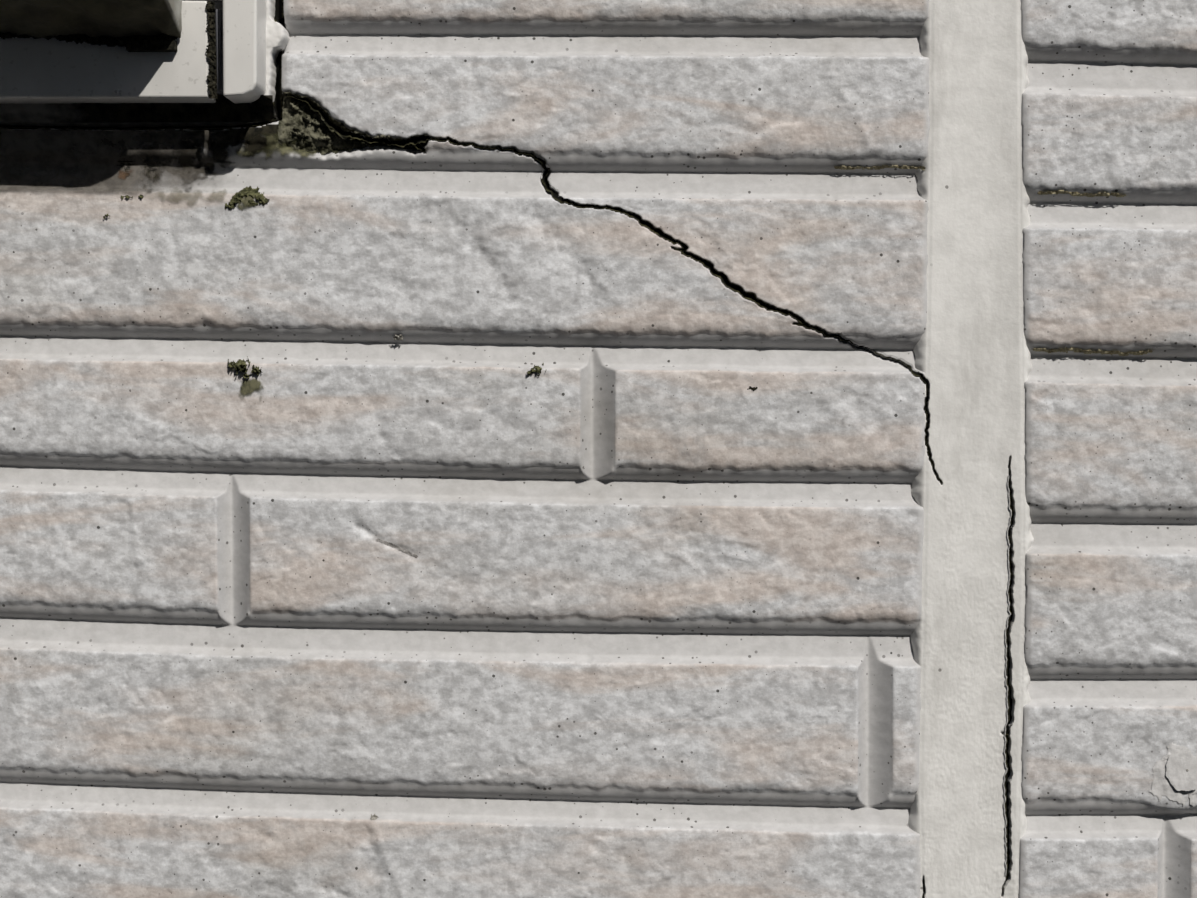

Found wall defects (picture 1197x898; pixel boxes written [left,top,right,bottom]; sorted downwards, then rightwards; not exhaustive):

damp [47,95,289,192]
crack [287,95,942,481]
crack [1003,467,1016,887]